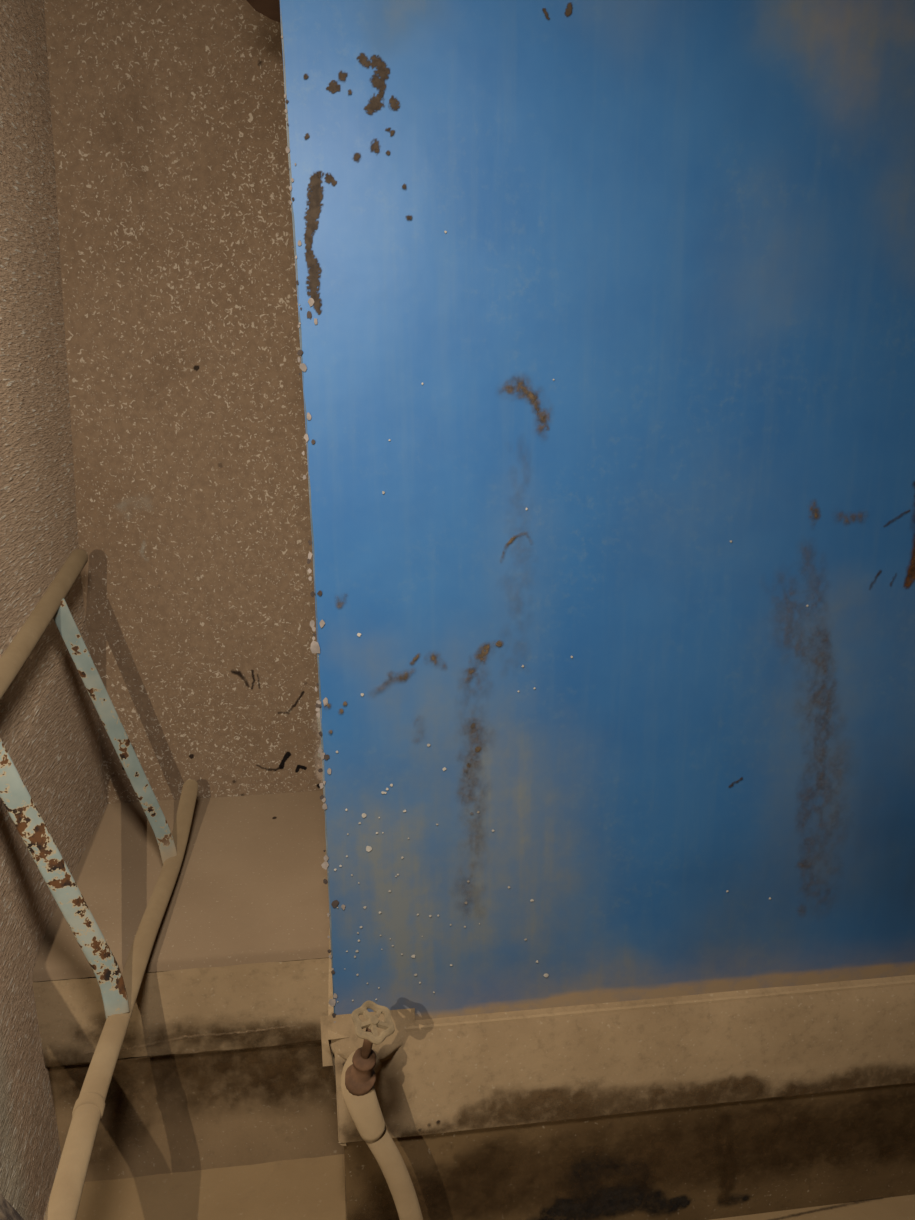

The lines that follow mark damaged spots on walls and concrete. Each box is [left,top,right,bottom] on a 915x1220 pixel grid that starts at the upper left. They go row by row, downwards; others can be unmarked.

corrosion [506,382,548,432]
corrosion [904,535,915,588]
corrosion [467,641,502,679]
damp [44,1054,90,1098]
damp [106,1027,336,1118]
damp [409,1068,915,1220]
damp [346,1185,400,1220]